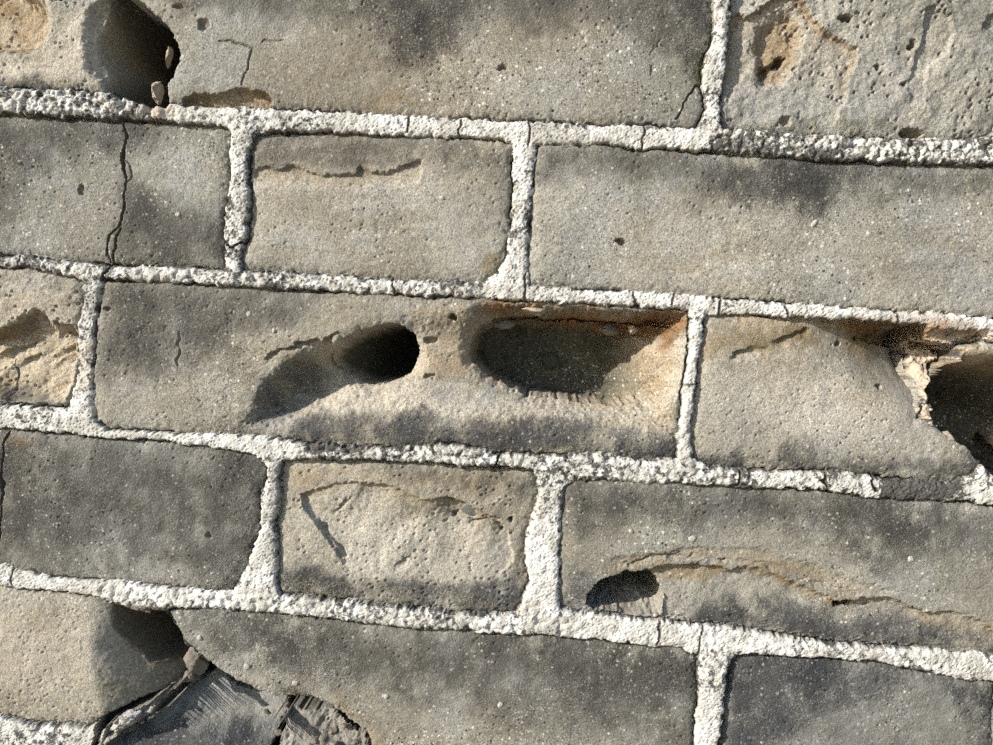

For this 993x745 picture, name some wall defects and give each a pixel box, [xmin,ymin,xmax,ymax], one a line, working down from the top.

spalling [723,0,858,136]
crack [100,118,134,282]
spalling [0,306,80,405]
water stain [223,361,678,460]
water stain [701,440,979,480]
spalling [641,563,993,654]